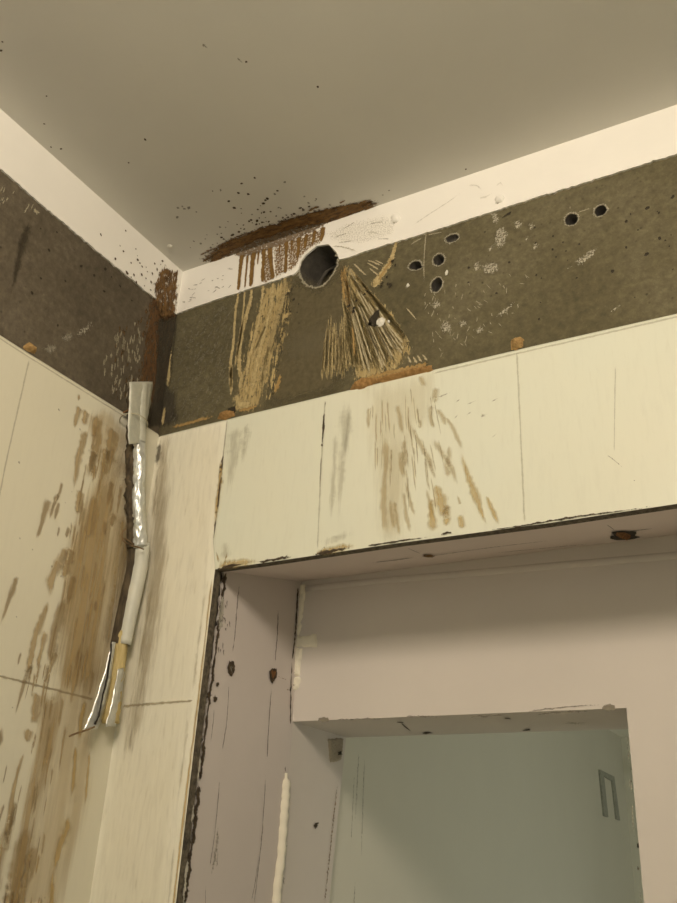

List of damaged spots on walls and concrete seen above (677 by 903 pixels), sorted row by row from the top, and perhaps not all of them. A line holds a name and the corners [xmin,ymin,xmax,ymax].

rust [190,181,390,290]
spalling [407,253,446,293]
spalling [368,310,390,327]
crack [318,402,326,484]
leakage [0,395,128,903]